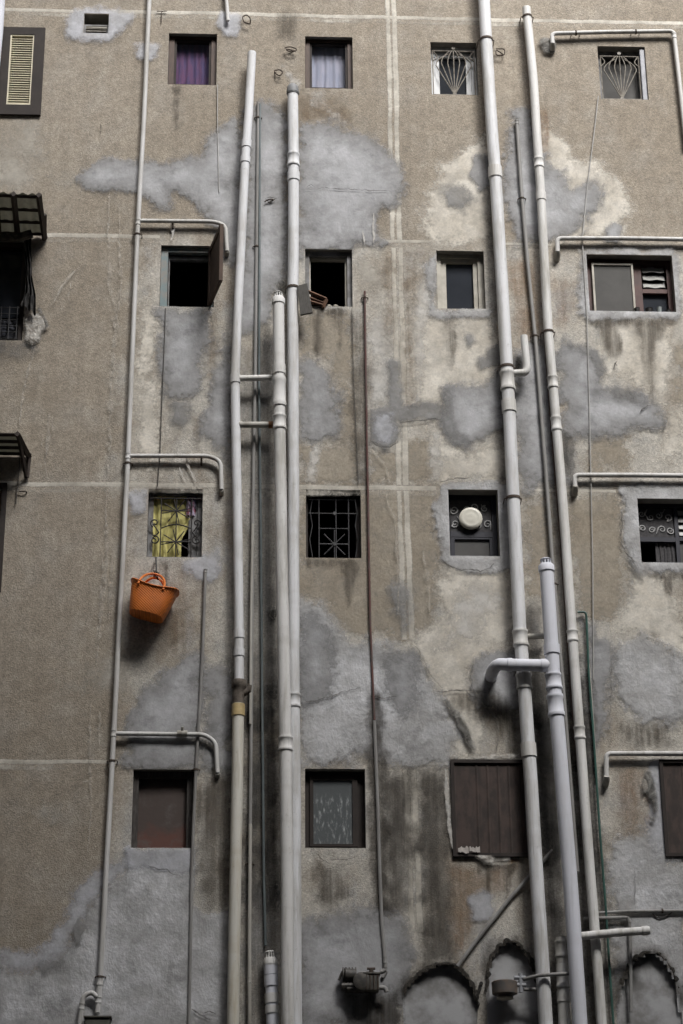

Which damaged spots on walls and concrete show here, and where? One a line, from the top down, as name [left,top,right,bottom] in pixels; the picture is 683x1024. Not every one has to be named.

leakage [444,186,473,208]
spalling [23,308,49,345]
leakage [406,280,432,404]
leakage [478,344,500,369]
leakage [565,319,673,375]
leakage [298,309,468,643]
leakage [367,693,453,961]
spalling [401,935,539,1024]
spalling [615,949,682,1024]